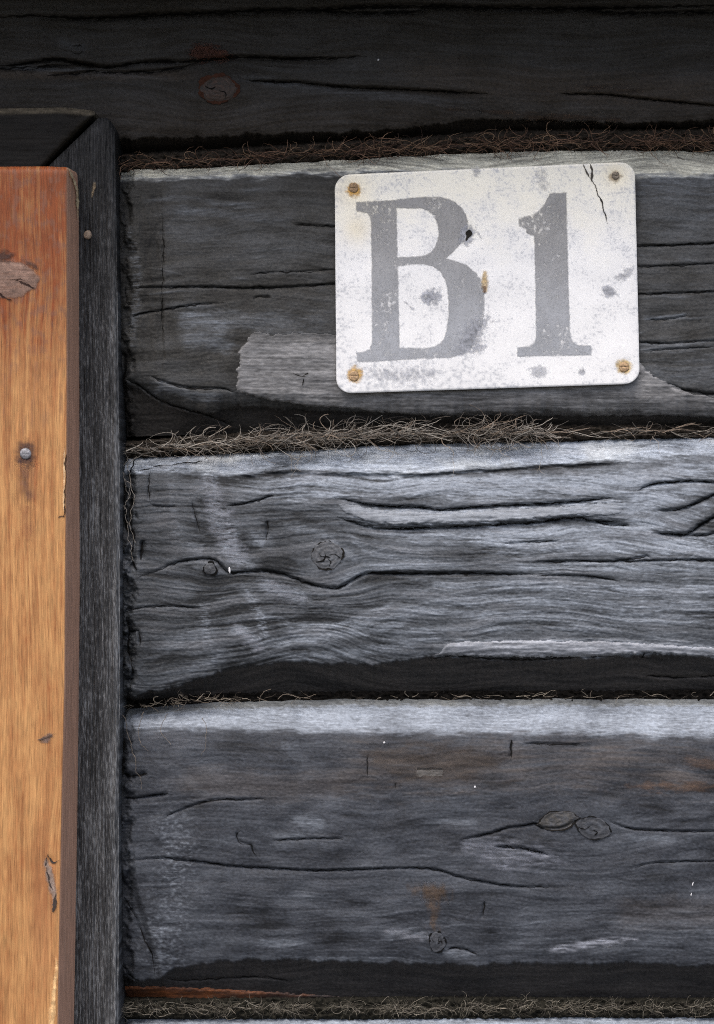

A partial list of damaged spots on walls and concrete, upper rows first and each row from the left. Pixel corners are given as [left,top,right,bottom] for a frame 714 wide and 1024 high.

crack [583,164,607,220]
crack [124,460,714,590]
crack [122,737,263,815]
crack [130,831,548,914]